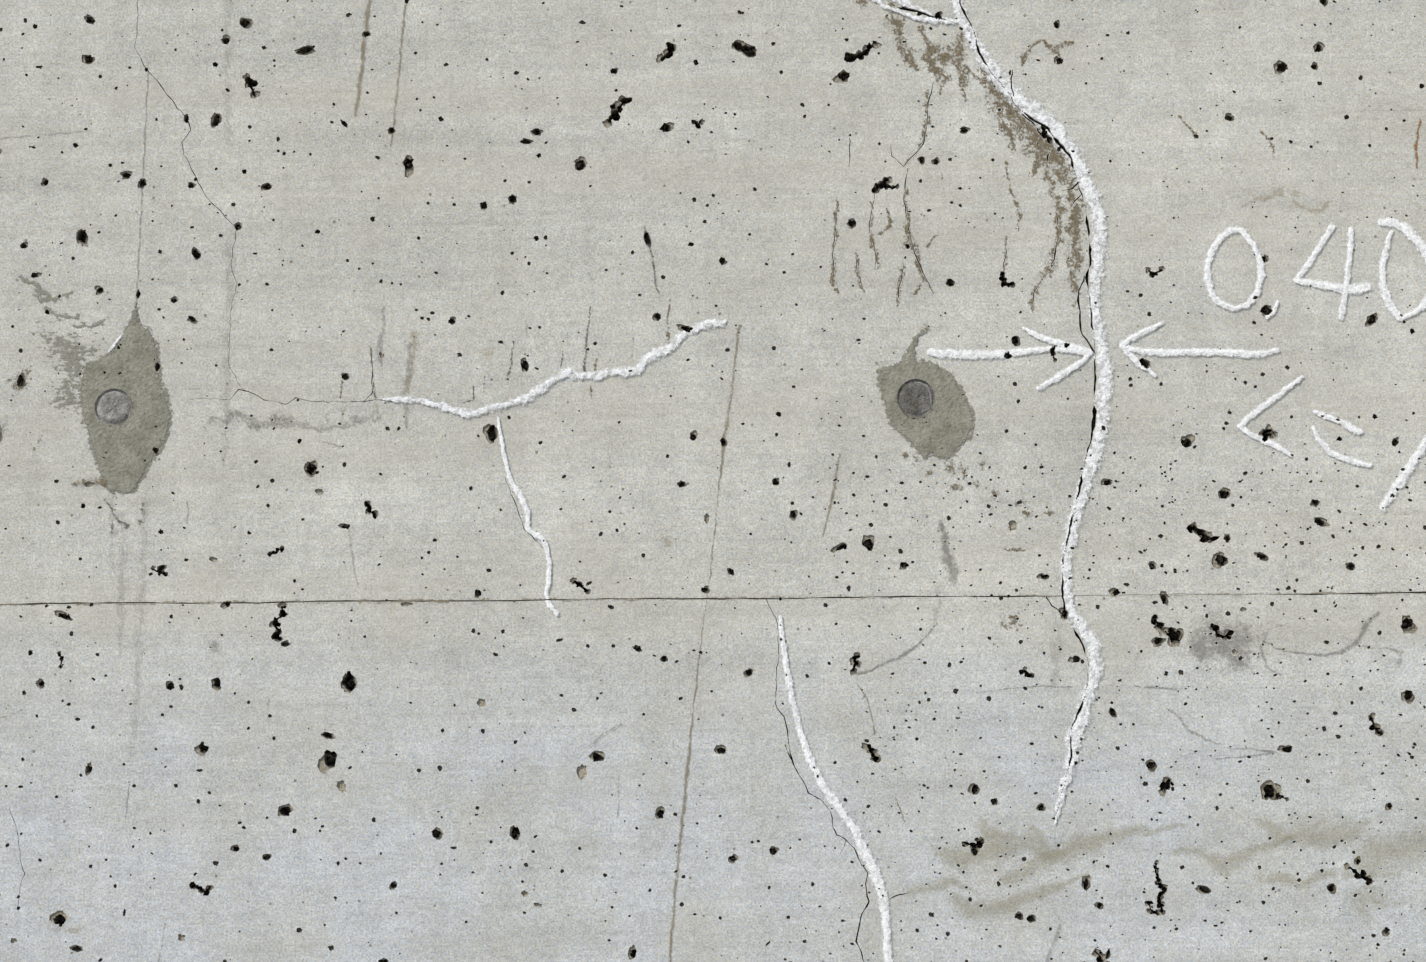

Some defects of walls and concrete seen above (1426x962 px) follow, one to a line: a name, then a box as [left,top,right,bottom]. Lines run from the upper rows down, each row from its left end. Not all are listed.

crack [832,85,933,298]
crack [897,0,1097,820]
crack [766,599,907,962]